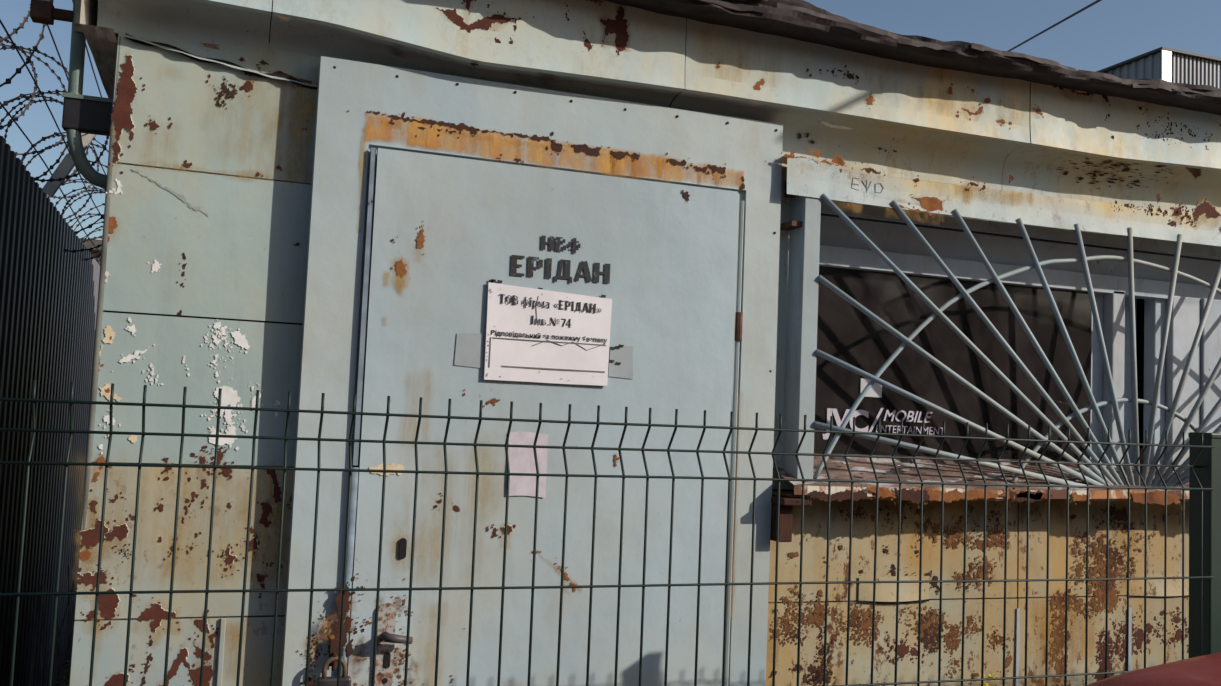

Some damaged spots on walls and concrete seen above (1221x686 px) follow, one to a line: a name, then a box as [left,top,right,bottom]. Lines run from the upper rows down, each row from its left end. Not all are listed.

corrosion [360,111,745,201]
corrosion [1056,158,1221,228]
corrosion [1137,106,1221,150]
peeling [98,317,164,454]
peeling [201,319,261,450]
corrosion [73,453,220,686]
corrosion [297,573,372,686]
corrosion [391,595,424,686]
corrosion [769,483,1056,686]
corrosion [1042,489,1189,686]